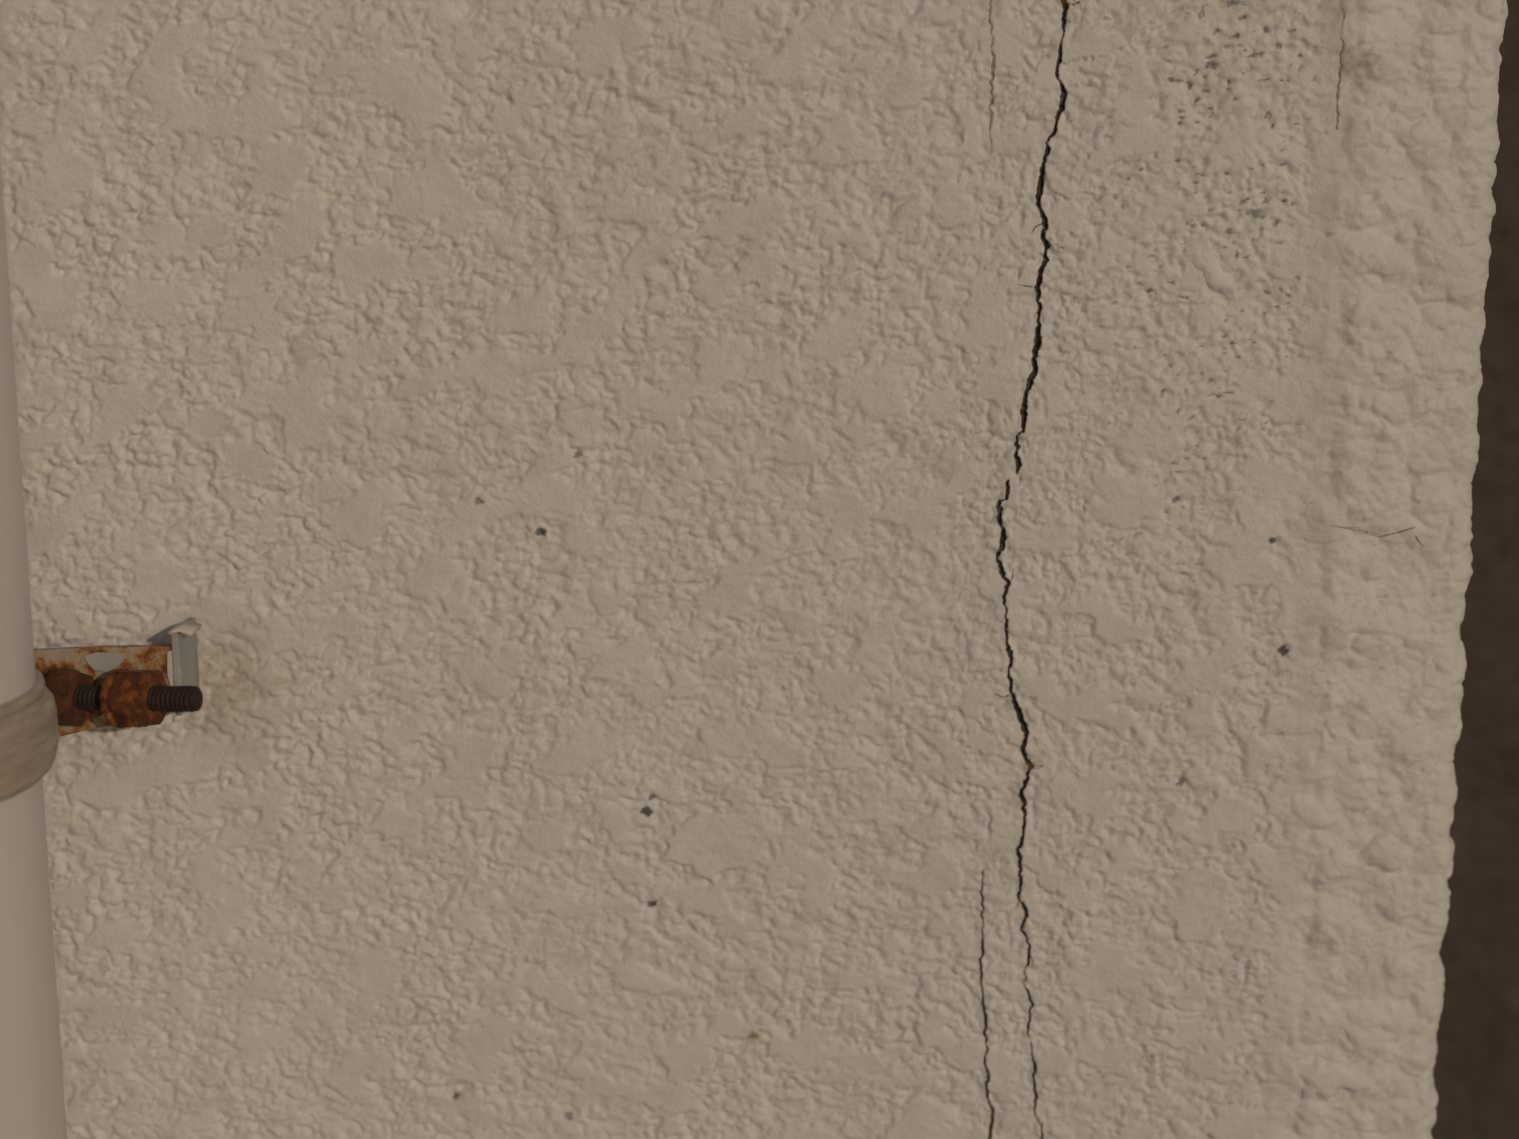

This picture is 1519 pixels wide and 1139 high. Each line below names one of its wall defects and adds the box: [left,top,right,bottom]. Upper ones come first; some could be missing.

crack [979,0,1080,1139]